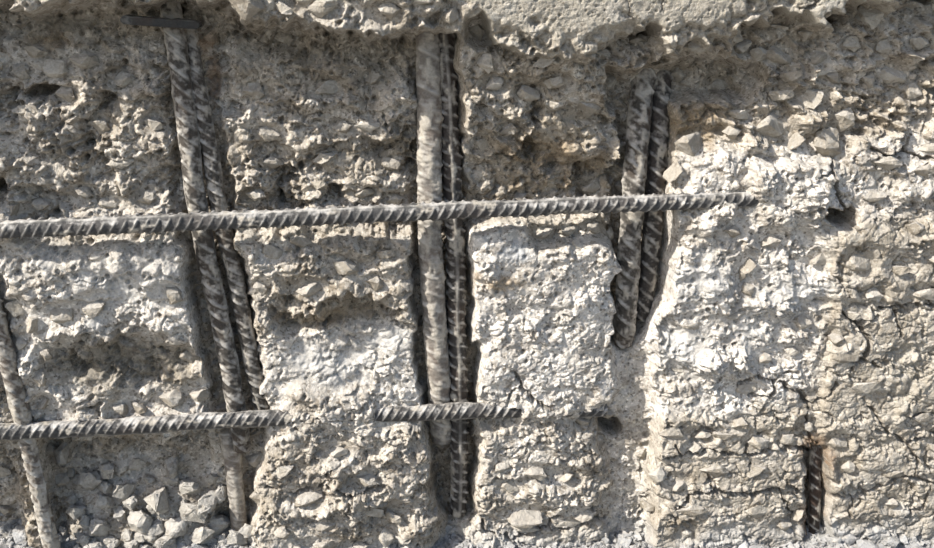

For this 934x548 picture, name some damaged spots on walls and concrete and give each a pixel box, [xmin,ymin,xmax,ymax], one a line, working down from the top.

spalling [0,0,209,221]
spalling [184,10,418,212]
spalling [228,0,630,204]
spalling [610,0,934,223]
crack [799,0,820,10]
spalling [0,132,934,548]
crack [507,369,555,410]
crack [655,286,934,518]
crack [475,508,606,546]